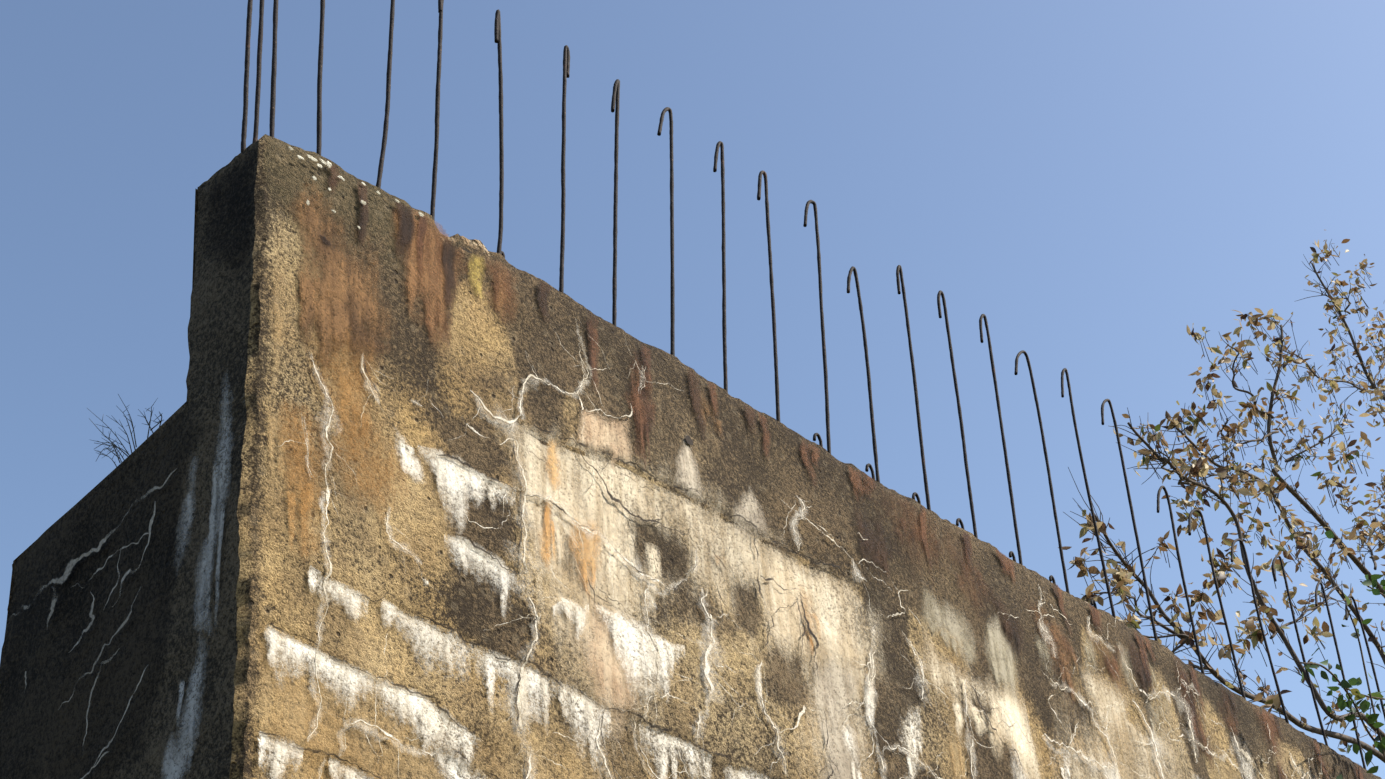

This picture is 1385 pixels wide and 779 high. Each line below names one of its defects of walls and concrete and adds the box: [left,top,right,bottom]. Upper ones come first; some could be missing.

rust [295,159,389,370]
rust [395,201,460,341]
crack [24,468,177,779]
water stain [266,628,477,779]
water stain [398,438,509,607]
water stain [480,654,609,747]
rust [541,503,555,560]
water stain [523,413,875,779]
crack [277,322,1322,779]
rust [801,441,820,478]
water stain [927,603,1039,779]
rust [1097,633,1155,690]